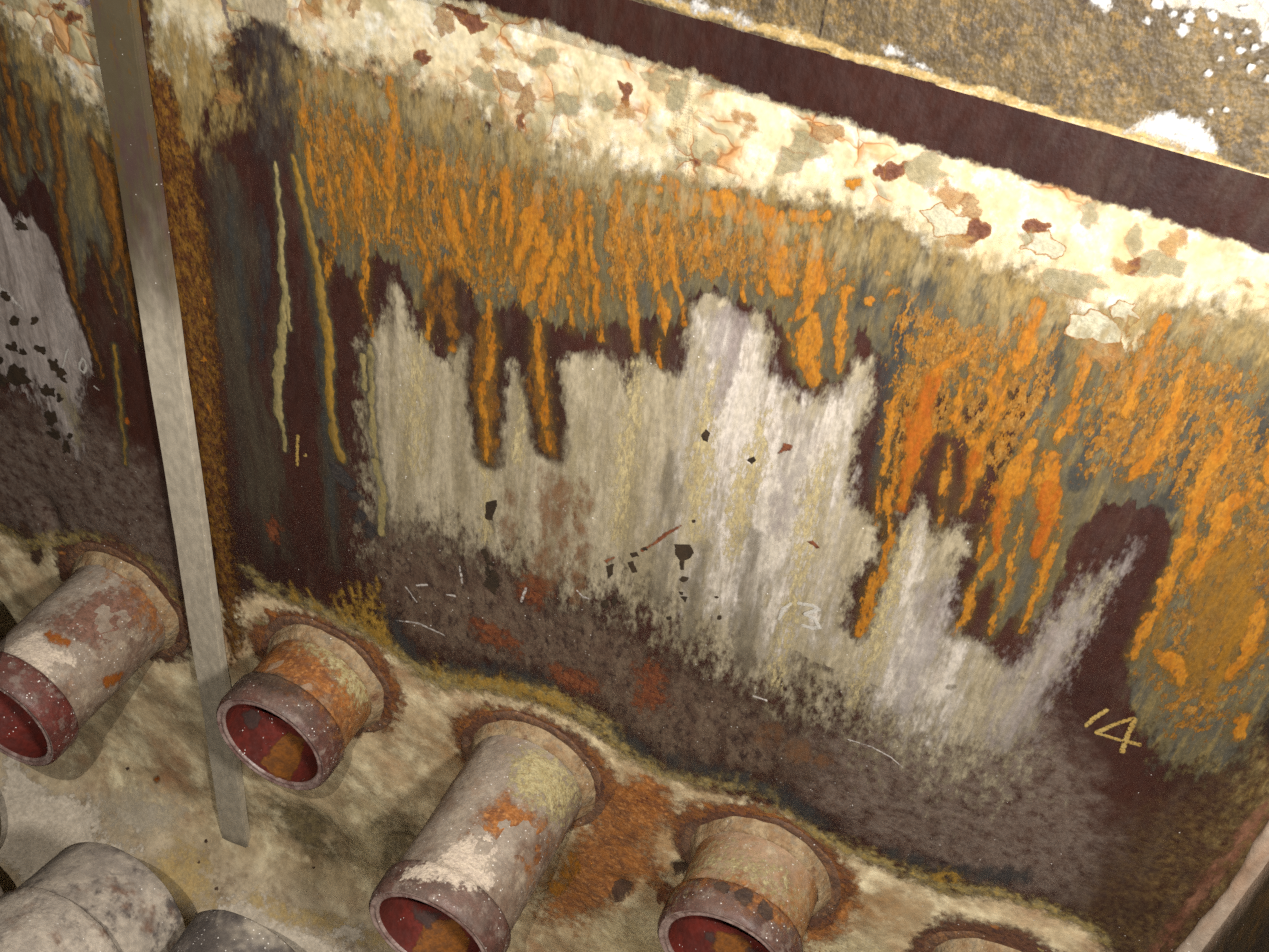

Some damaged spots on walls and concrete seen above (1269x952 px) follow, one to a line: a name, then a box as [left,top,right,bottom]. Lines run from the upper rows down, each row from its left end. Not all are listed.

damp [0,13,137,466]
rust [147,62,407,739]
peeling [485,500,497,521]
rust [359,516,829,789]
peeling [604,547,647,578]
rust [451,701,862,952]
damp [242,566,1110,952]
peeling [674,544,694,602]
peeling [150,0,1269,368]
damp [150,21,1269,802]
rust [290,75,1269,742]
damp [1150,780,1269,952]